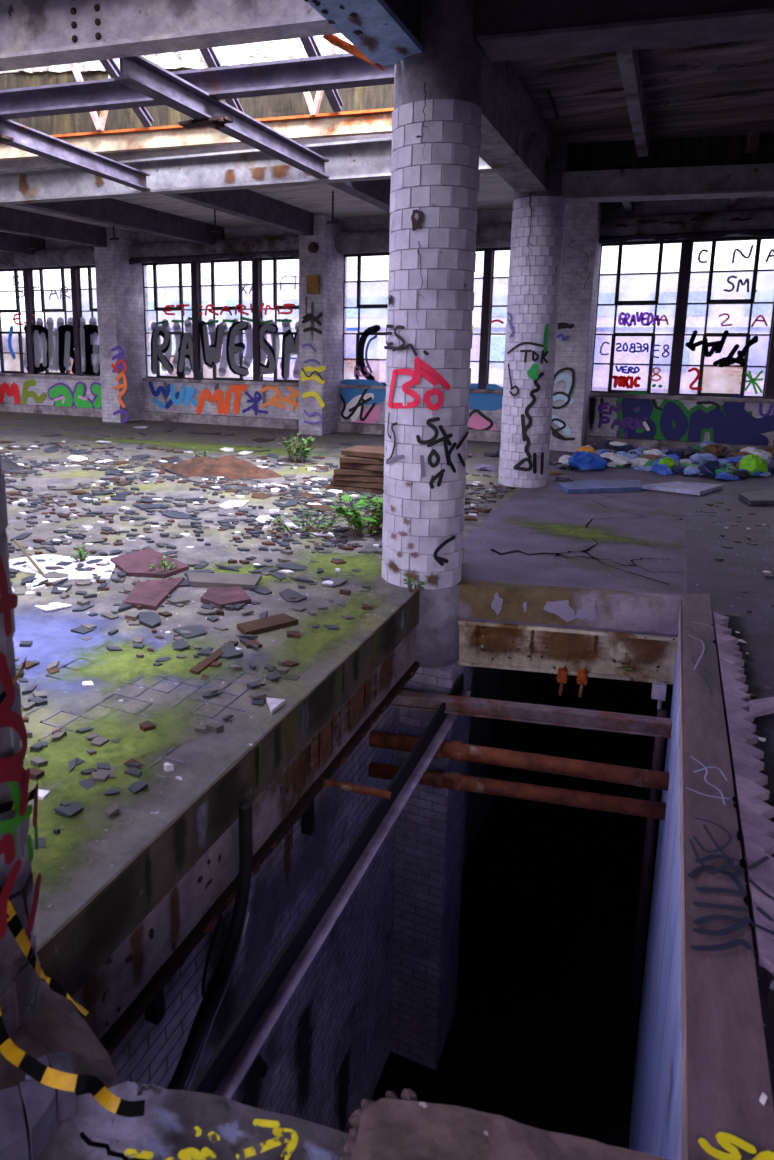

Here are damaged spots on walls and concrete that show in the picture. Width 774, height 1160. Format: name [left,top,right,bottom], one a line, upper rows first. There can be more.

corrosion [256,108,394,122]
corrosion [50,125,210,138]
corrosion [251,165,290,180]
crack [491,489,671,585]
peeling [491,593,503,615]
peeling [543,598,598,622]
corrosion [474,626,601,662]
corrosion [622,638,670,666]
spalling [467,602,688,1160]
spalling [106,705,400,1091]
spalling [257,822,418,1160]
crack [80,1132,149,1160]